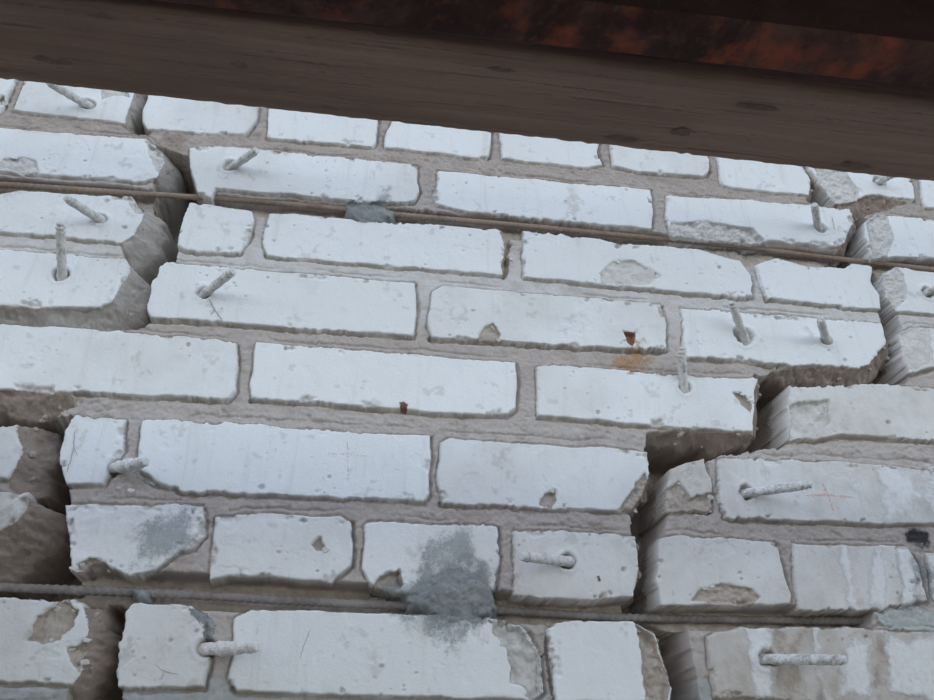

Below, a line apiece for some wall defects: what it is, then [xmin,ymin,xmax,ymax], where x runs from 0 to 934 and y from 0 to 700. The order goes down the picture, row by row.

crack [0,93,198,332]
spalling [0,156,346,214]
spalling [394,212,934,310]
crack [805,172,814,202]
spalling [809,168,859,204]
crack [827,195,905,269]
crack [622,279,891,687]
crack [0,390,126,700]
spalling [0,558,408,644]
water stain [373,532,504,644]
spalling [490,583,863,700]